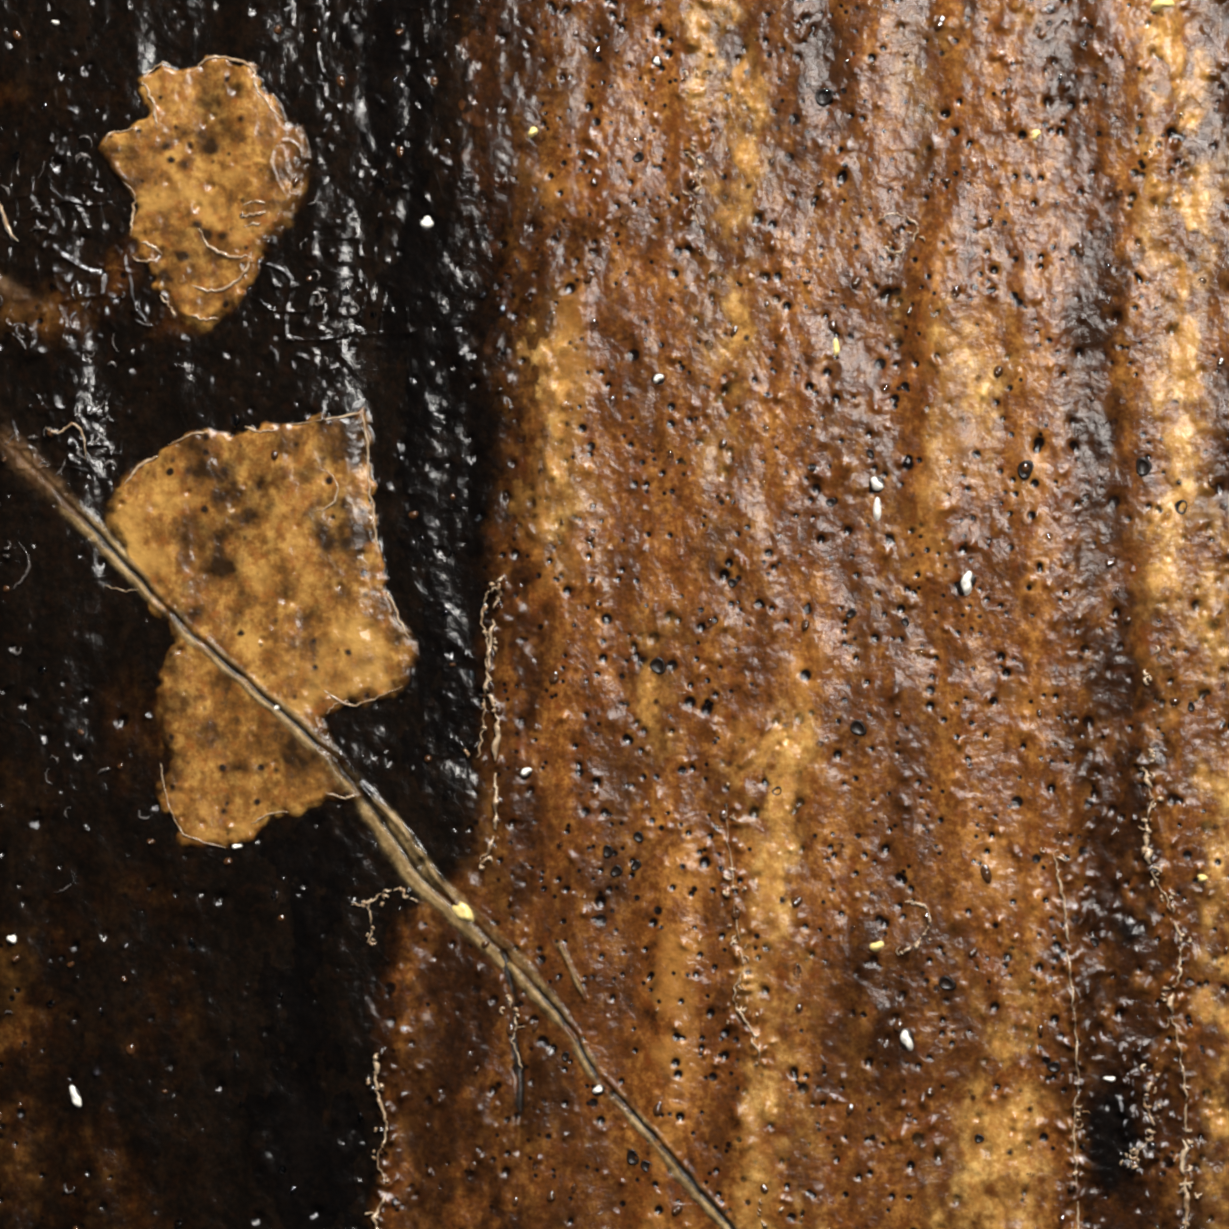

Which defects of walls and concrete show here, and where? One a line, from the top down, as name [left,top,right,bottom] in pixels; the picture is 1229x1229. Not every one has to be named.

peeling [99,55,309,330]
rust [684,0,769,231]
rust [1140,0,1211,133]
crack [3,434,157,602]
crack [178,627,319,749]
peeling [109,408,416,848]
rust [516,332,579,541]
rust [928,299,1004,469]
rust [1139,162,1229,681]
rust [748,706,822,947]
crack [333,769,736,1229]
rust [929,1078,1048,1229]